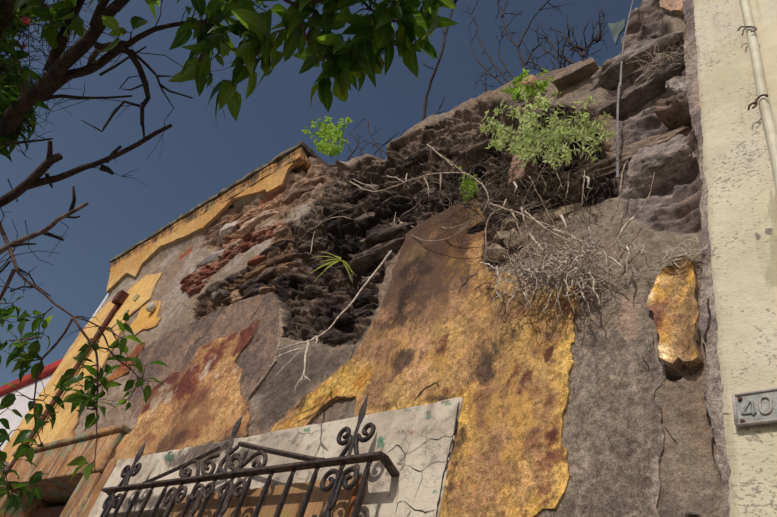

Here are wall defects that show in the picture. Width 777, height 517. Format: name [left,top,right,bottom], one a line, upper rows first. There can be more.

peeling [106,0,725,517]
peeling [2,409,35,464]
peeling [29,272,164,447]
crack [375,382,459,517]